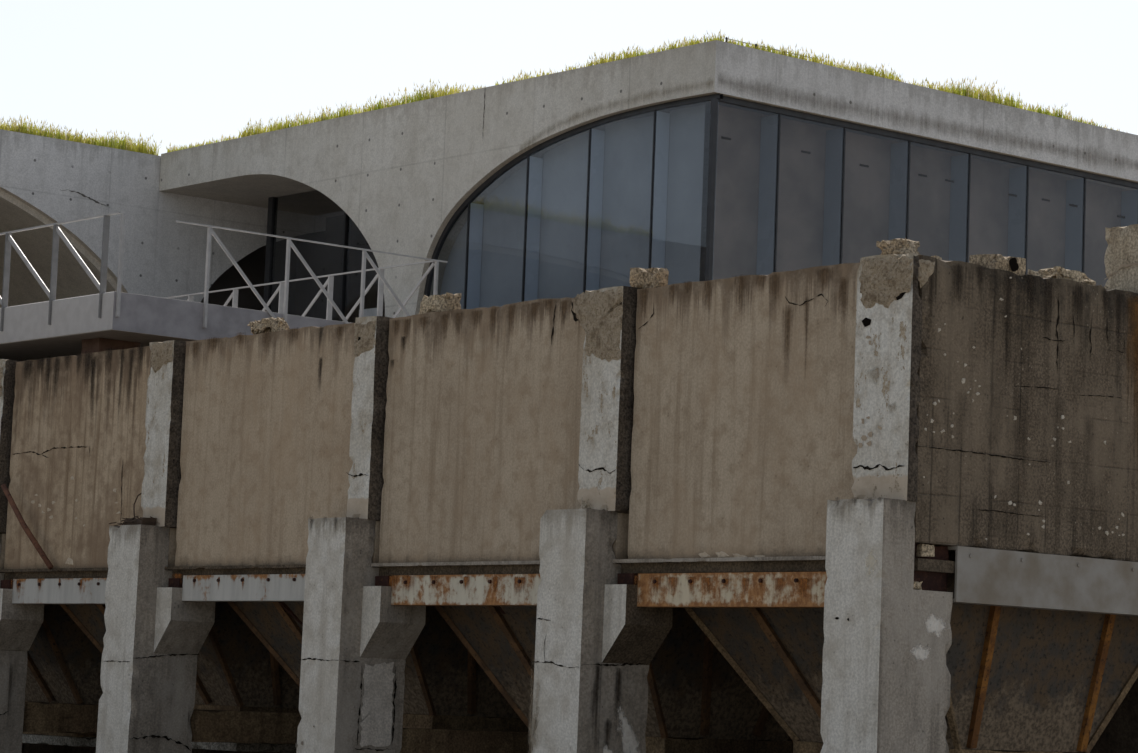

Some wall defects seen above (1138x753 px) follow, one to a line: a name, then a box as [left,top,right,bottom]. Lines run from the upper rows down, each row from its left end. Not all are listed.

spalling [859,256,935,345]
spalling [574,288,623,362]
leakage [24,345,143,399]
crack [13,446,90,458]
crack [853,445,1051,470]
corrosion [724,578,784,590]
crack [129,735,193,752]